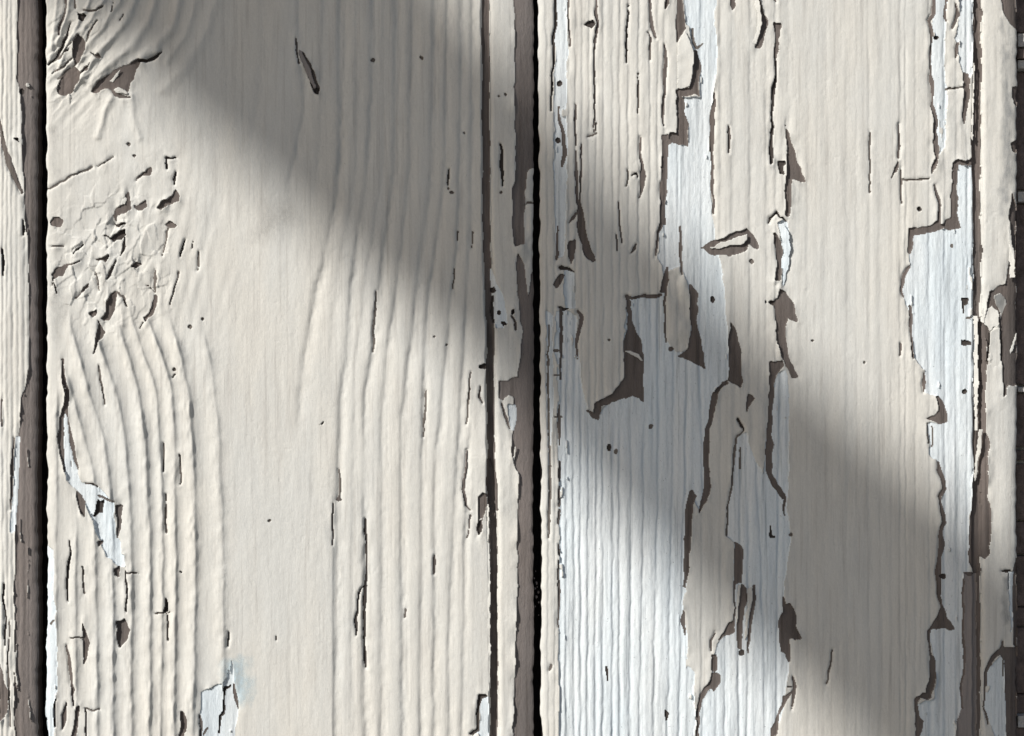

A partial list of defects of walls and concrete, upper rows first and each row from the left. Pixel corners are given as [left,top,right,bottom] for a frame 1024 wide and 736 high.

peeling [91,52,162,98]
peeling [10,0,101,736]
peeling [76,254,117,321]
peeling [104,190,180,249]
peeling [143,270,158,321]
peeling [490,0,805,736]
peeling [900,0,1018,736]
peeling [57,359,130,647]
crack [354,518,368,667]
peeling [179,661,238,736]